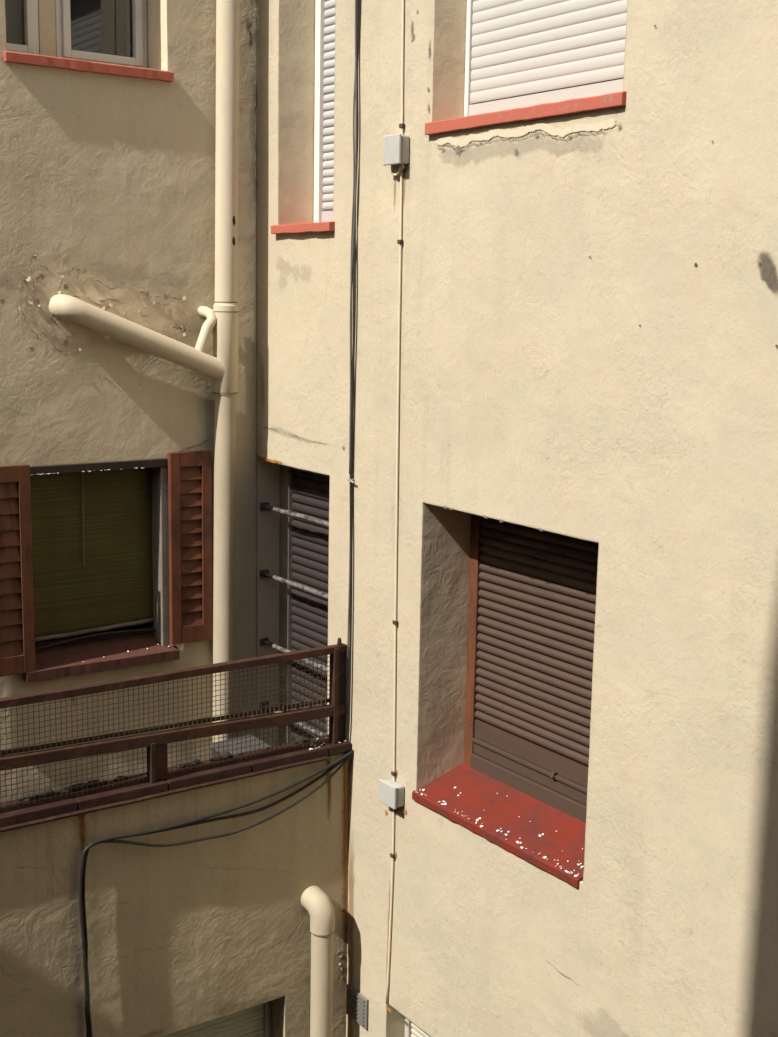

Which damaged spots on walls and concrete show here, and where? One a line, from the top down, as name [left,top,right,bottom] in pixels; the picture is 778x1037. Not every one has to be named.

flaking render [0,252,203,359]